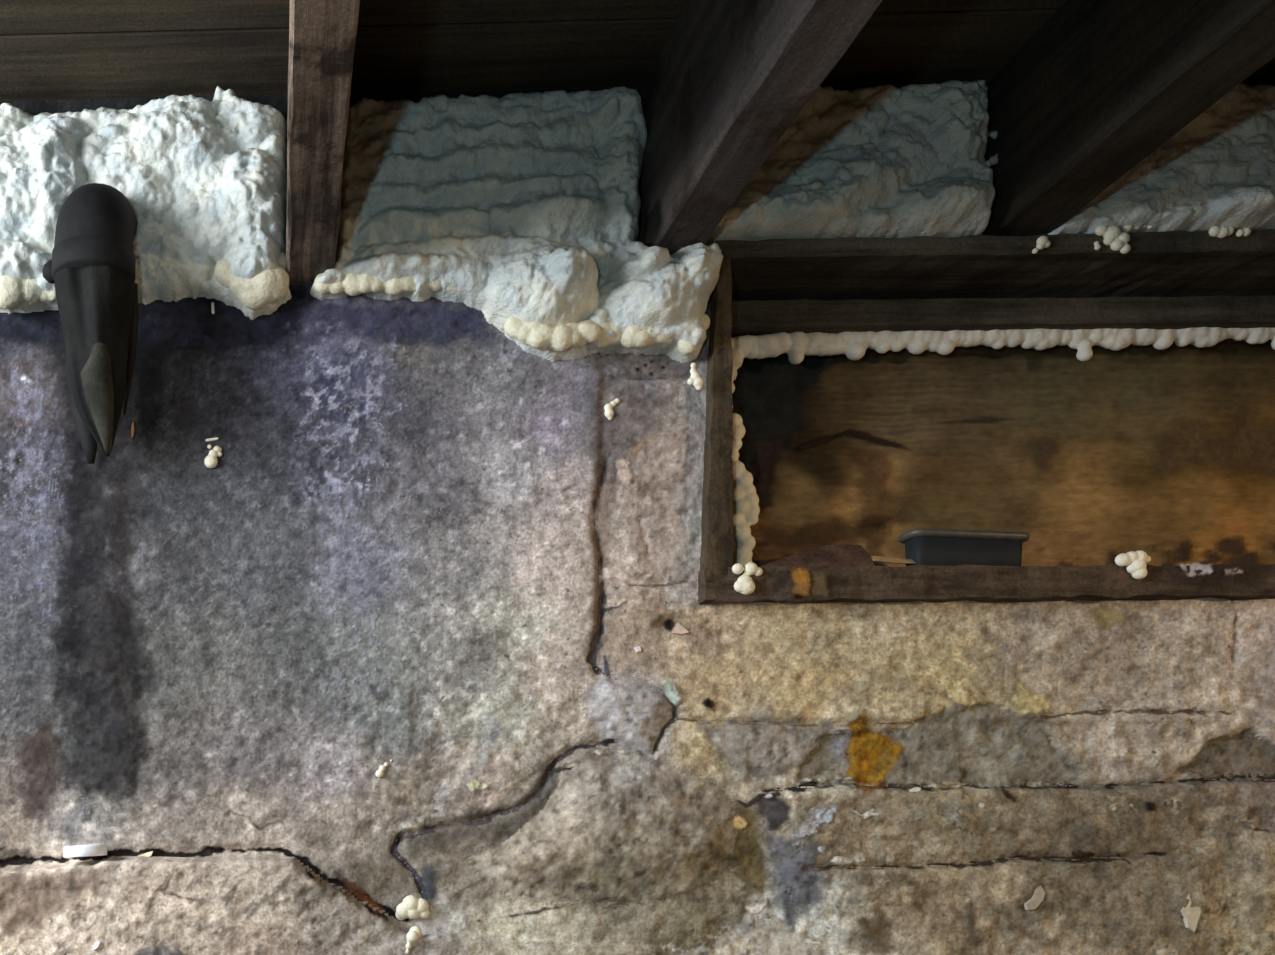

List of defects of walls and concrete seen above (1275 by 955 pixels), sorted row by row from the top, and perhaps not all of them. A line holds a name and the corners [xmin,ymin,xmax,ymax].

leakage [0,338,162,843]
crack [0,465,816,922]
corrosion [845,715,903,792]
crack [738,776,1116,808]
crack [1152,773,1275,784]
crack [819,850,1166,871]